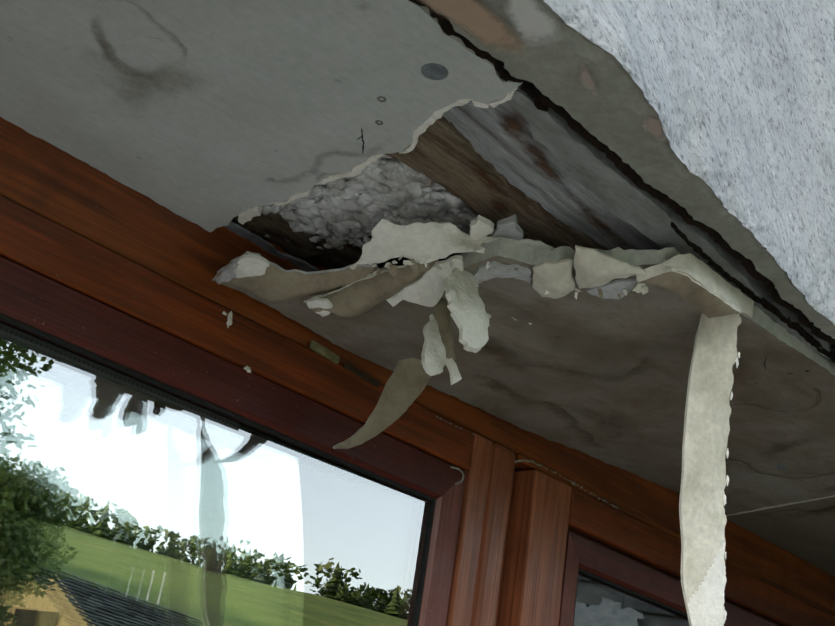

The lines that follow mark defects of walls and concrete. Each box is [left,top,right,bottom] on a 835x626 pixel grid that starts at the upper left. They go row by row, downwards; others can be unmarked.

spalling [238,154,384,225]
spalling [399,86,518,153]
crack [409,0,835,363]
peeling [645,118,664,138]
flaking render [212,214,648,449]
peeling [679,313,741,626]